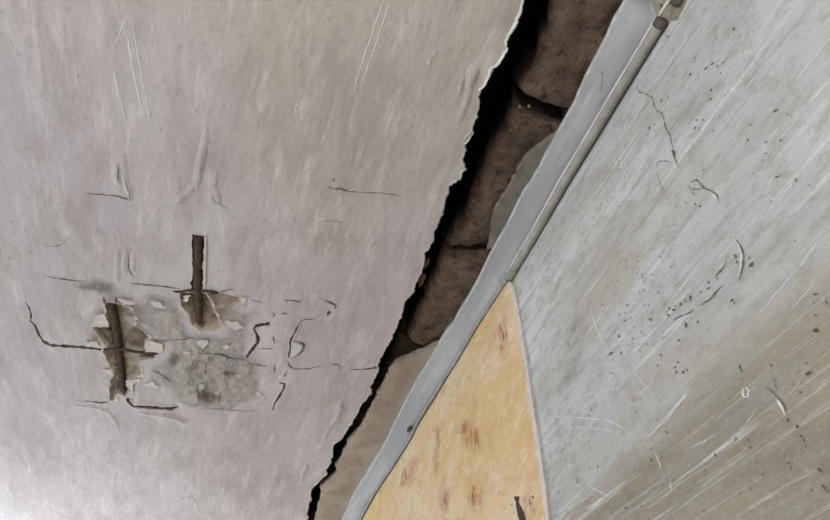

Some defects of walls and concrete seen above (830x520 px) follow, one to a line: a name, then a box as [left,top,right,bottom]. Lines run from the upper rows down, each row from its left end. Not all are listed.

crack [623,91,677,187]
crack [691,179,719,200]
crack [245,0,623,520]
crack [25,303,101,351]
peeling [85,234,255,408]
crack [85,397,179,413]